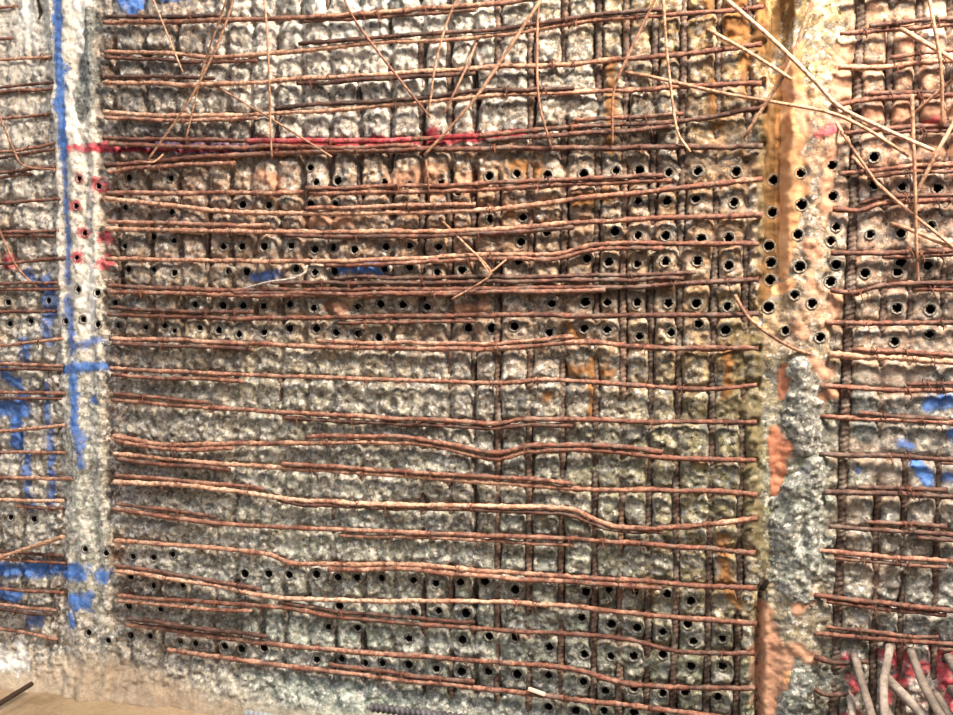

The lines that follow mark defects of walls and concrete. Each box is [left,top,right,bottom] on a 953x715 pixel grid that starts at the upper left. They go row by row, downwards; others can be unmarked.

corrosion [722,0,806,102]
corrosion [708,79,725,131]
corrosion [757,75,783,304]
spalling [846,213,858,251]
spalling [102,0,854,715]
spalling [826,318,953,338]
spalling [829,351,953,370]
spalling [817,383,953,444]
spalling [819,443,953,488]
spalling [824,489,953,524]
spalling [810,495,953,680]
spalling [814,629,912,715]